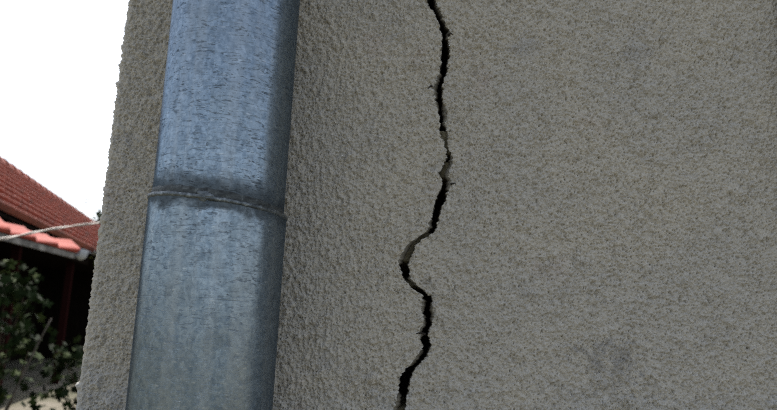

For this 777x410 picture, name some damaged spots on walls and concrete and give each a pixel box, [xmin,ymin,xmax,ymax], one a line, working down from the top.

crack [393,0,456,410]